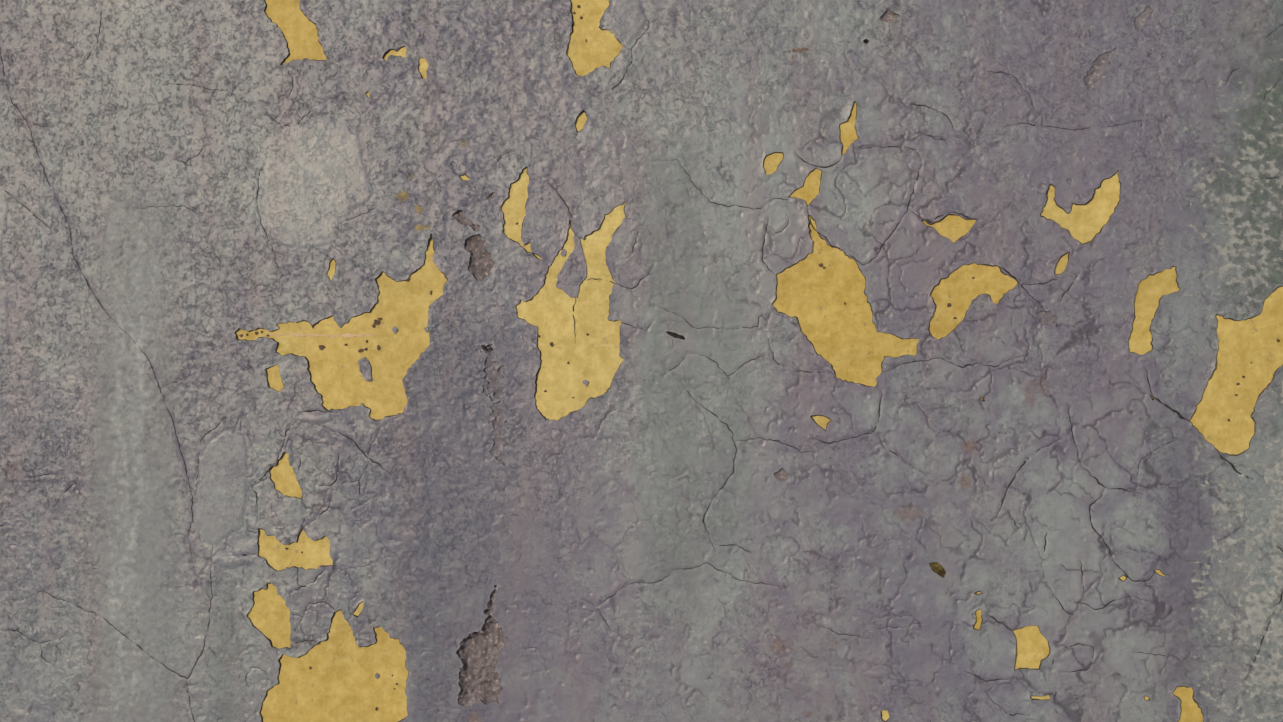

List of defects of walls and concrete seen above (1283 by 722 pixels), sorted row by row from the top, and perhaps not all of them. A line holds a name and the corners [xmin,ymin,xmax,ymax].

crack [0,48,254,721]
crack [252,409,398,527]
peeling [246,528,409,722]
peeling [234,234,448,421]
peeling [485,167,626,421]
crack [573,232,1023,640]
crack [651,104,975,274]
peeling [772,168,1018,387]
crack [1001,267,1078,315]
peeling [1040,170,1121,276]
crack [991,368,1190,712]
peeling [1189,286,1283,456]